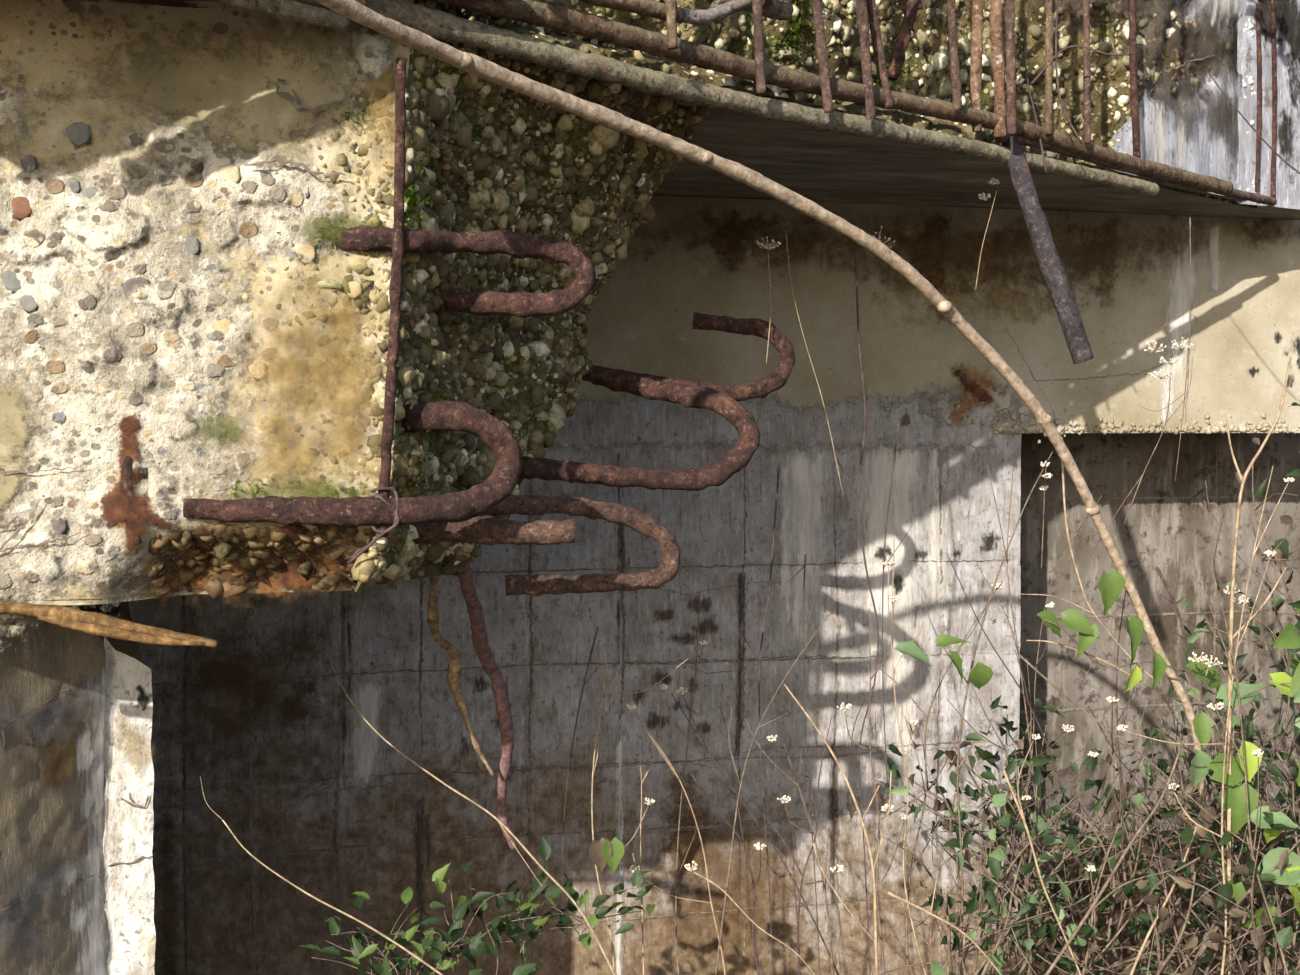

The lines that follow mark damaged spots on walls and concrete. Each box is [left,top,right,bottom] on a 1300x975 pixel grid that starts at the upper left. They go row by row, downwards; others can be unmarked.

spalling [487,15,586,43]
spalling [714,0,1256,155]
water stain [1139,105,1186,168]
water stain [688,215,1049,310]
spalling [0,37,807,634]
rust [949,364,994,421]
crack [0,465,83,552]
rust [100,411,173,555]
rust [152,523,361,593]
water stain [340,608,381,784]
water stain [656,782,793,957]
water stain [829,746,839,905]